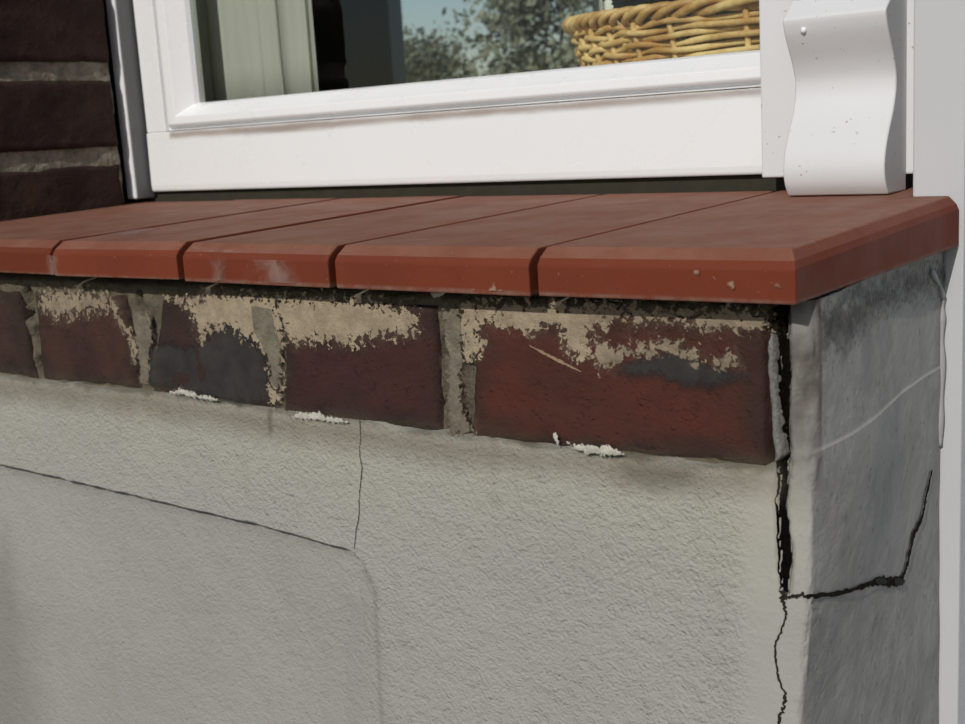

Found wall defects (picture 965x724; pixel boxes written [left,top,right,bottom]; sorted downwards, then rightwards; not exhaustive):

flaking render [38,282,154,386]
damp [148,324,274,405]
flaking render [162,283,421,410]
peeling [293,411,348,424]
flaking render [431,286,790,463]
crack [354,420,363,547]
crack [772,309,933,724]